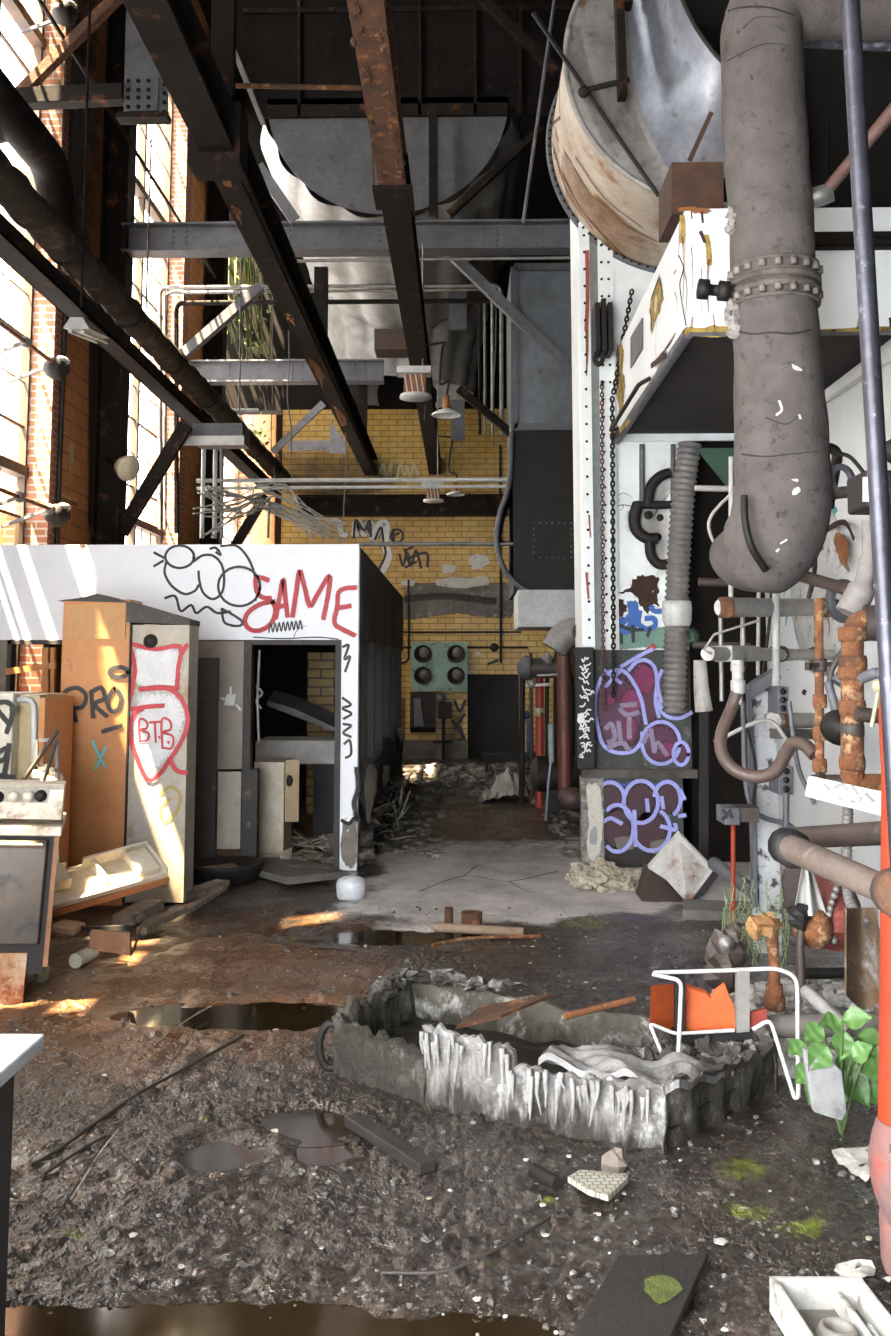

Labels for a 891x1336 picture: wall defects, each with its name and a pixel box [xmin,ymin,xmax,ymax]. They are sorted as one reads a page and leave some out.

rust [349,2,406,184]